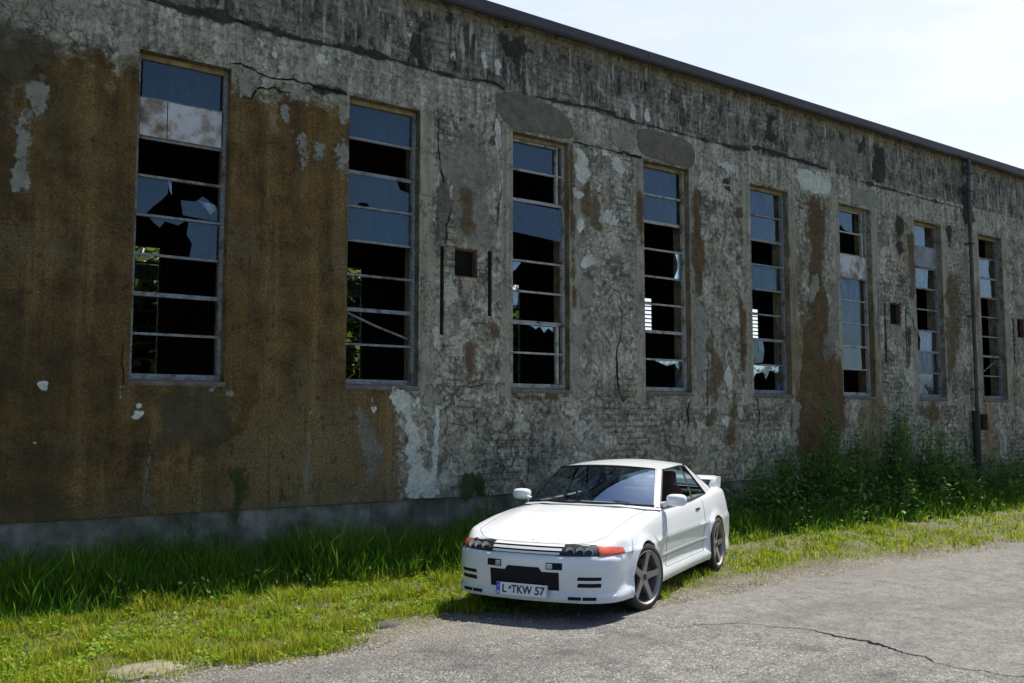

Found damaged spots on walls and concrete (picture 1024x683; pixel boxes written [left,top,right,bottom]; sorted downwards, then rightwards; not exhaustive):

crack [232,63,313,99]
peeling [10,80,50,193]
crack [438,118,446,184]
peeling [572,148,590,199]
peeling [602,147,626,180]
damp [611,104,650,153]
damp [791,125,831,196]
peeling [599,209,619,226]
peeling [580,254,595,269]
crack [604,280,629,401]